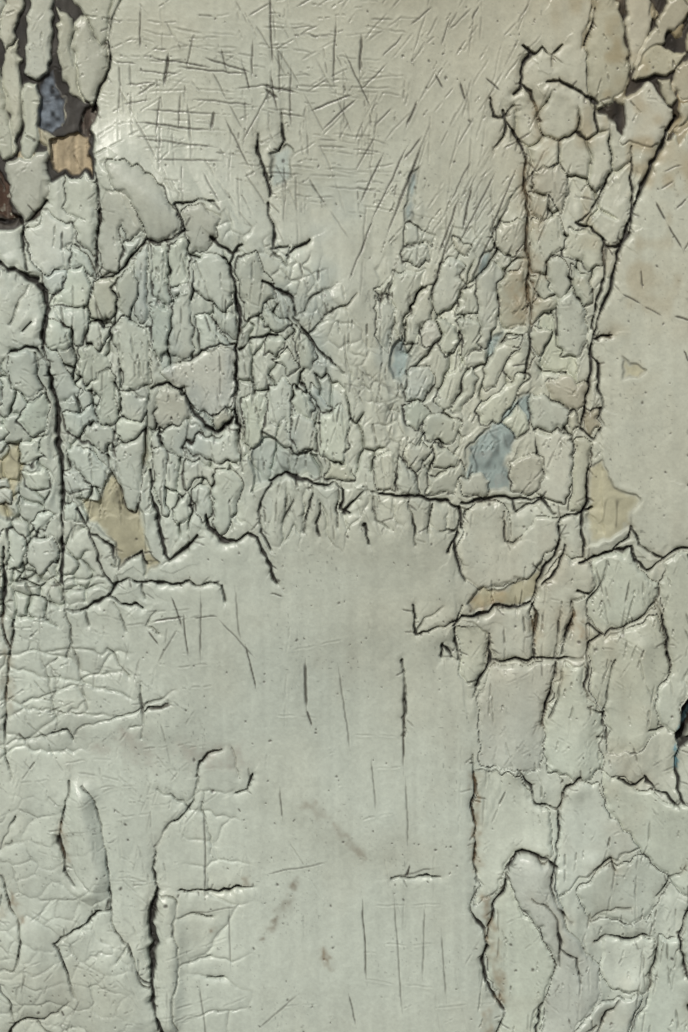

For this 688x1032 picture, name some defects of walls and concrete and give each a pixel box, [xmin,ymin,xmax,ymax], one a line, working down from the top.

crack [92,0,123,114]
crack [490,7,600,381]
peeling [0,0,688,777]
crack [0,112,688,773]
peeling [0,776,153,1032]
crack [0,747,255,1032]
peeling [158,758,268,1032]
crack [391,872,442,880]
peeling [456,500,688,1032]
crack [470,755,688,1032]
crack [617,726,688,807]